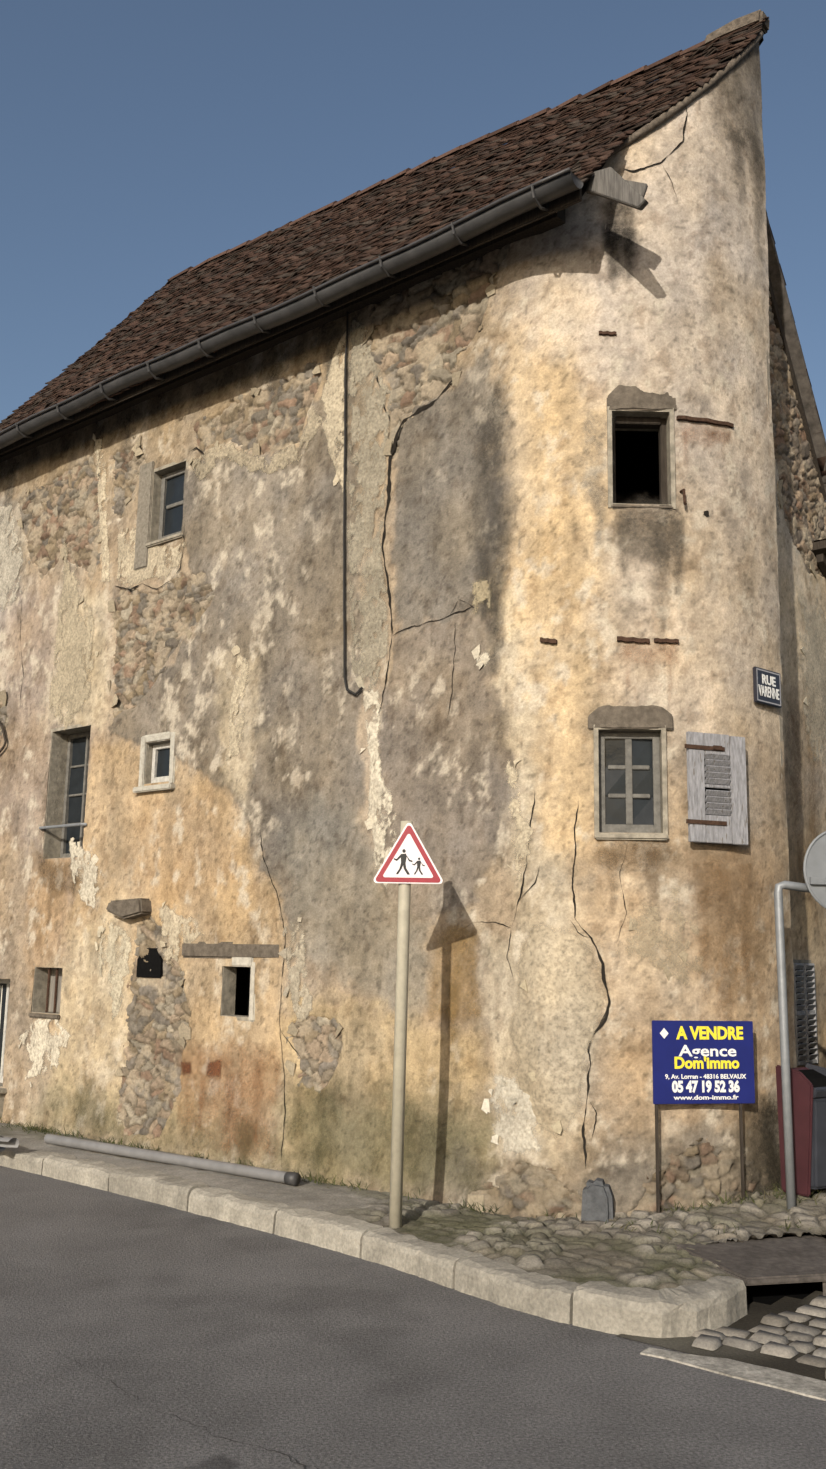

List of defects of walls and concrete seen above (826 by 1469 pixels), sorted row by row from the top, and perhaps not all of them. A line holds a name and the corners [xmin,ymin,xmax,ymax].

leakage [604,200,633,270]
crack [623,108,688,197]
spalling [0,433,215,729]
crack [365,334,474,723]
spalling [769,291,826,578]
spalling [69,837,200,1139]
spalling [278,917,343,1093]
crack [467,793,627,1167]